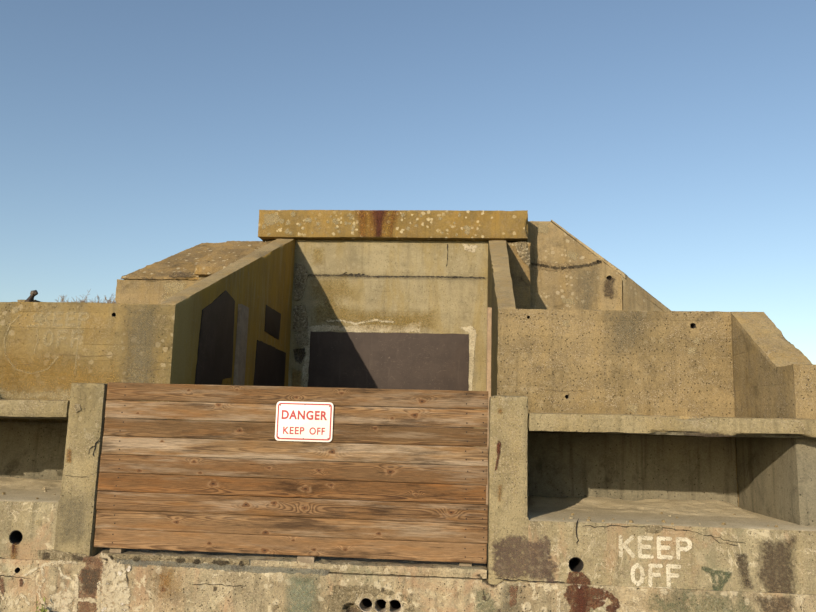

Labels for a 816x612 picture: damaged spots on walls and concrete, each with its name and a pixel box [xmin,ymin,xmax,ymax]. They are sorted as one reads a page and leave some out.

corrosion [358,210,398,237]
water stain [604,278,615,299]
crack [576,518,743,546]
water stain [737,537,795,612]
corrosion [564,572,620,612]